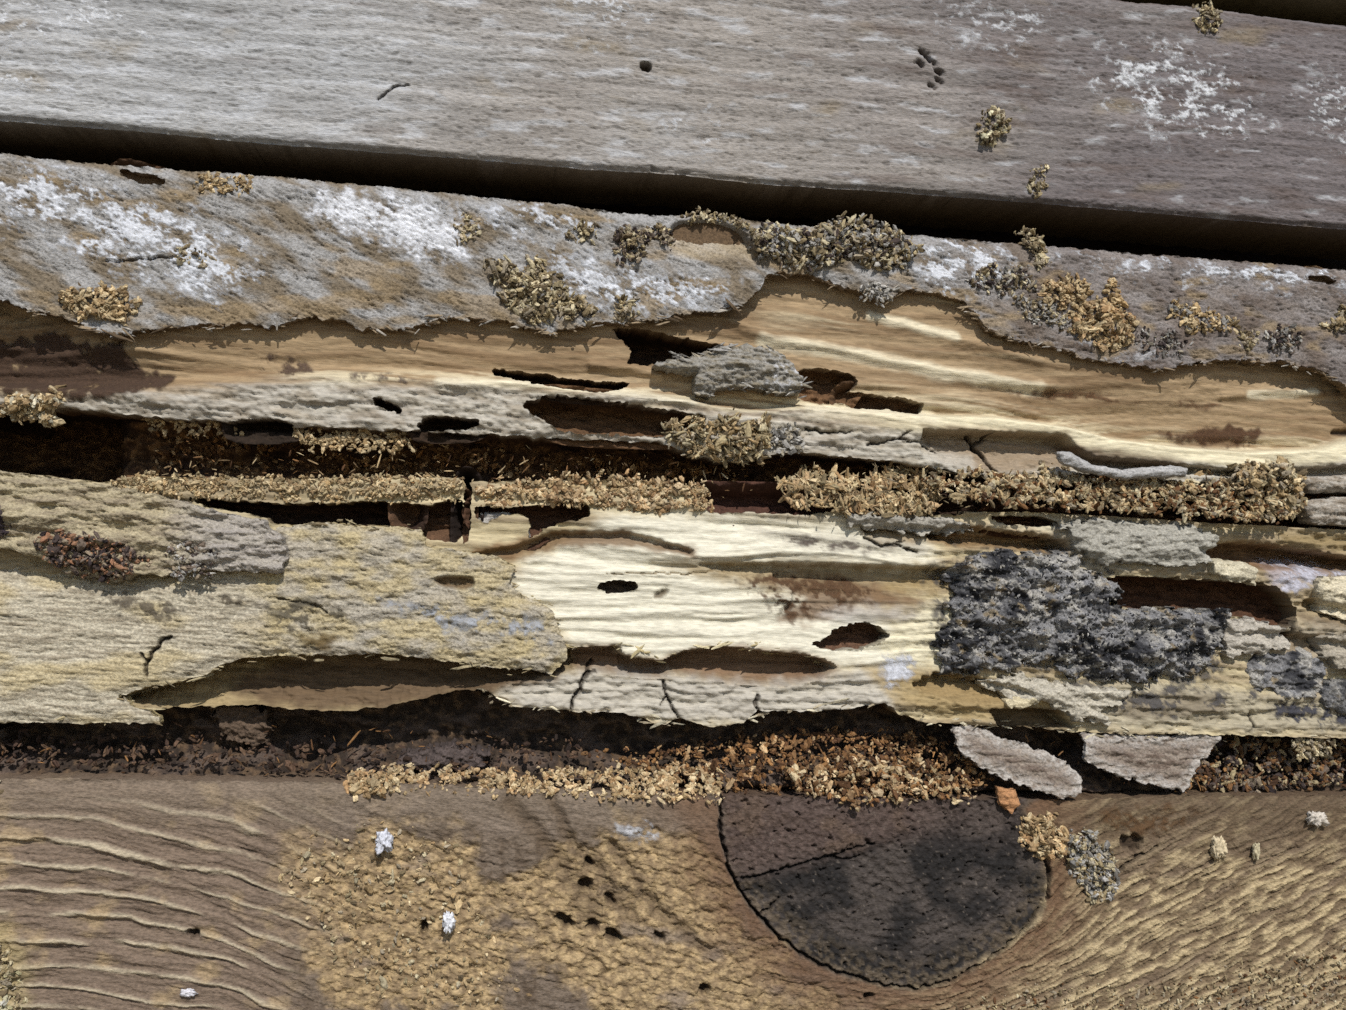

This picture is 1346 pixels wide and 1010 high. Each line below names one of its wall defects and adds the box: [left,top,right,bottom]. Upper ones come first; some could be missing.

peeling [652,342,814,400]
peeling [844,511,973,537]
peeling [1052,517,1259,586]
peeling [1220,616,1291,659]